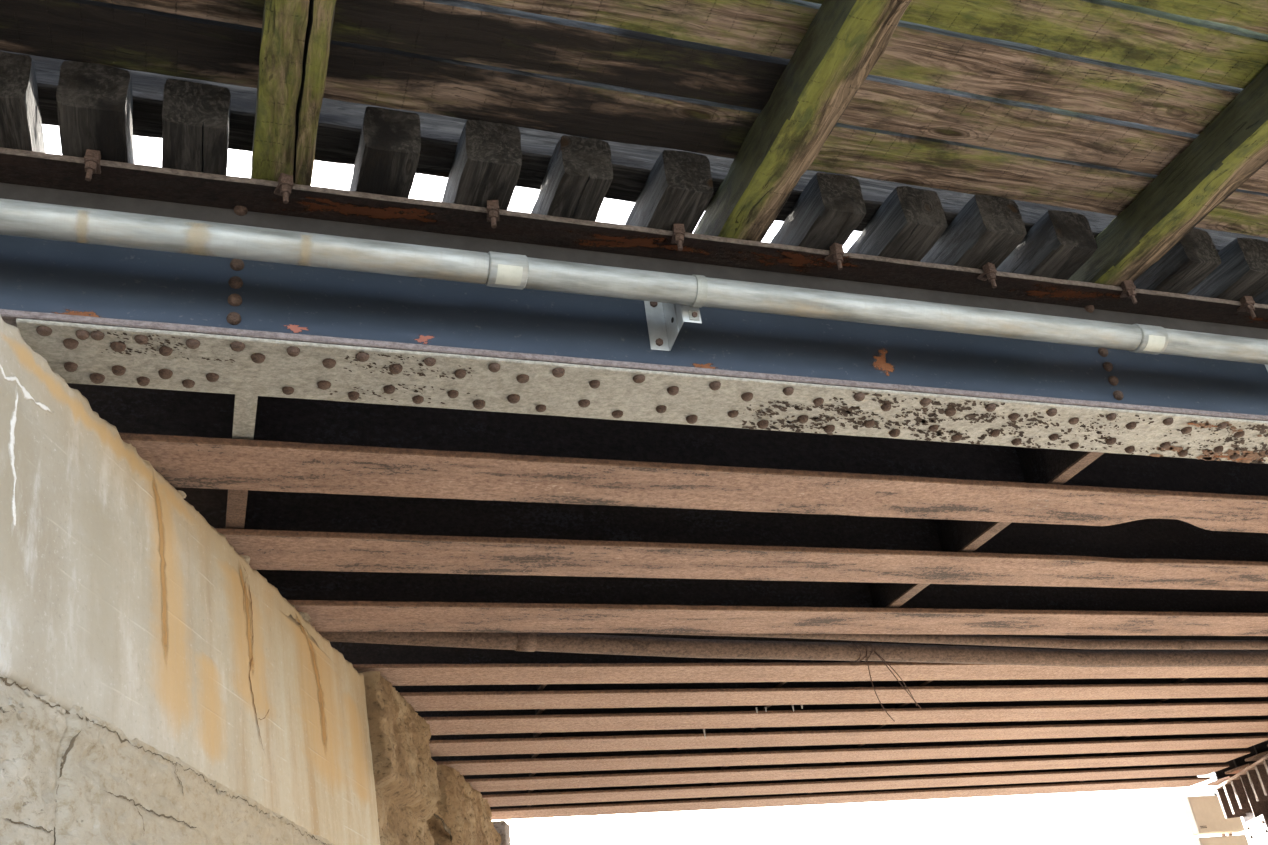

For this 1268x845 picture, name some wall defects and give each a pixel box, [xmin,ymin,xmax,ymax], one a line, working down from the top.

rust [275,196,437,223]
water stain [0,379,35,607]
rust [0,329,374,811]
rust [872,348,894,376]
rust [737,392,1268,464]
crack [242,564,269,753]
crack [0,677,329,845]